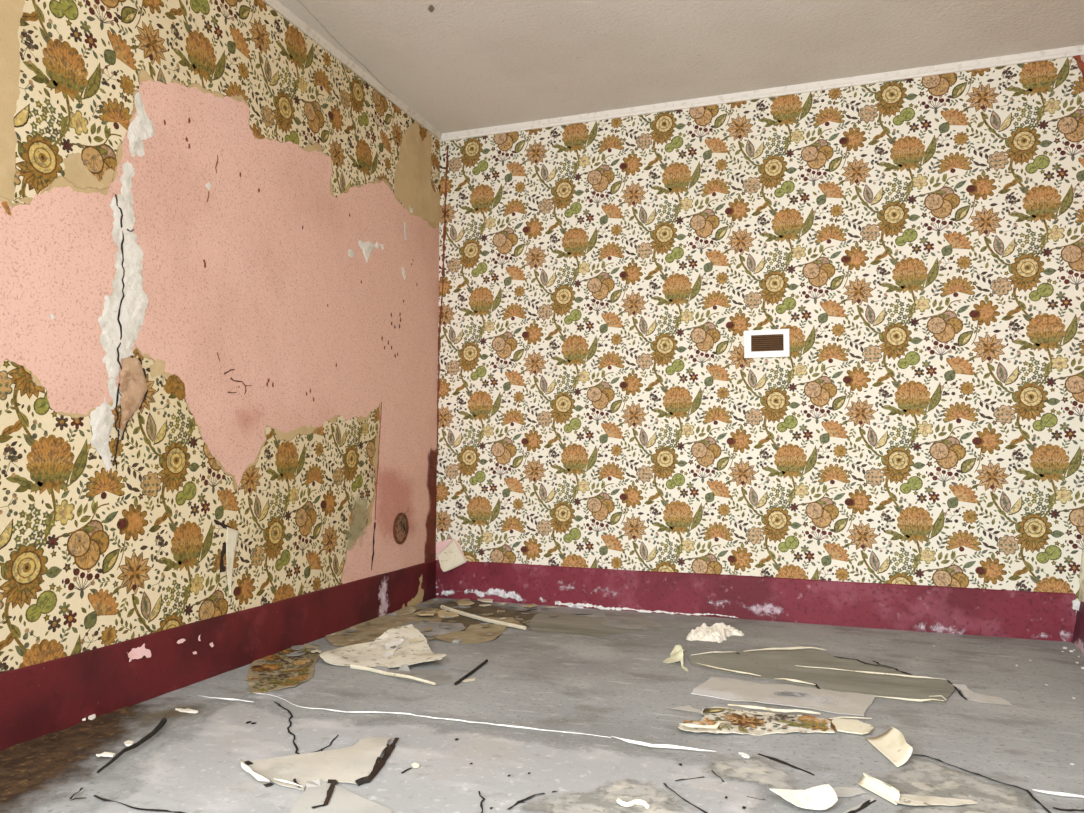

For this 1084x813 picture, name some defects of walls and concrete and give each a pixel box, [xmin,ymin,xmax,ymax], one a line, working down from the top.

flaking render [348,239,384,263]
flaking render [89,92,166,473]
crack [114,194,134,469]
crack [274,701,339,754]
crack [69,788,185,813]
crack [478,791,557,813]
crack [663,770,724,813]
crack [758,753,814,775]
crack [912,754,1051,813]